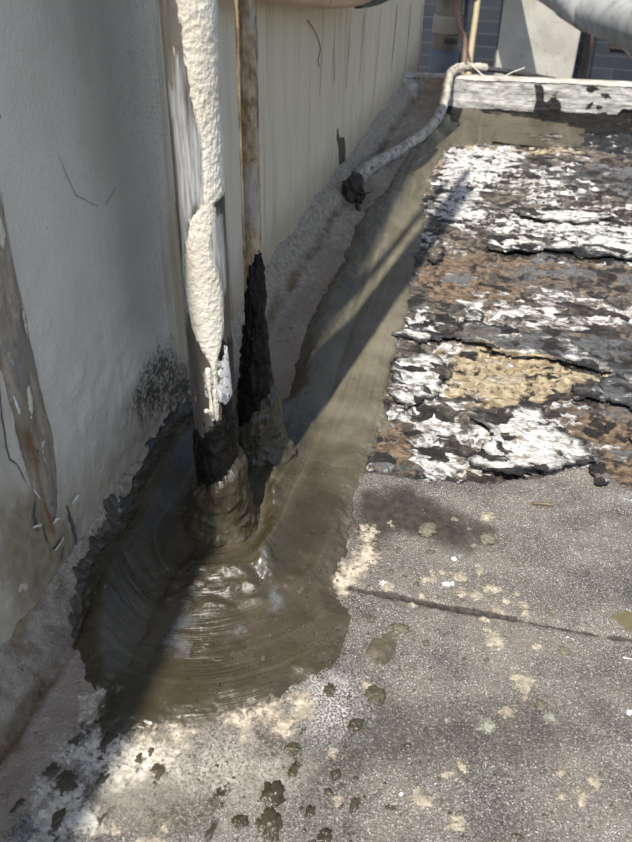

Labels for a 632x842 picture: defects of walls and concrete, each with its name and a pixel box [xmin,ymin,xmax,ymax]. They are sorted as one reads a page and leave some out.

leakage [337,130,346,164]
leakage [134,346,190,431]
leakage [69,583,82,629]